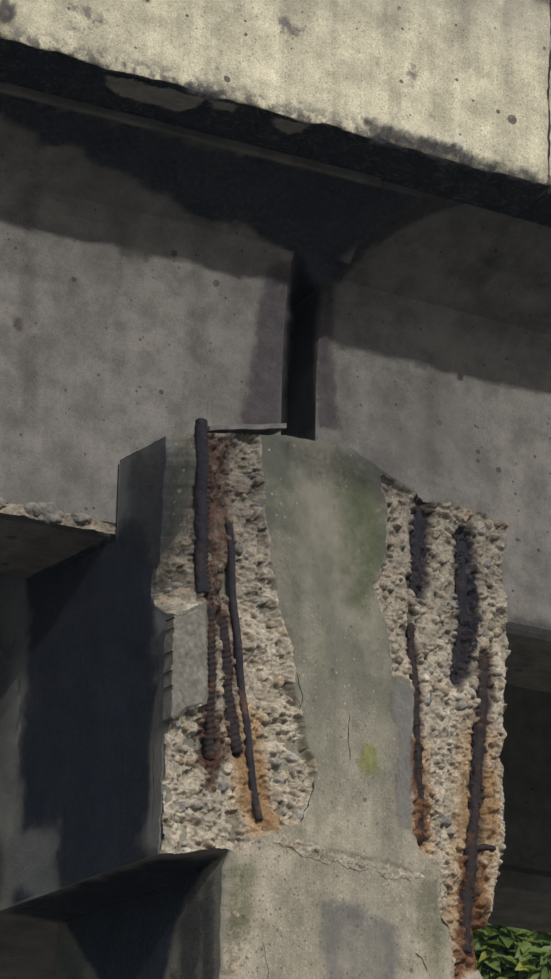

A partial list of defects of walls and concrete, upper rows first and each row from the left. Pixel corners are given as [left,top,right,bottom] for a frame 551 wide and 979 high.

damp [0,37,551,439]
corrosion [194,714,230,789]
spalling [151,418,320,854]
corrosion [411,739,431,837]
spalling [371,474,511,979]
corrosion [454,856,491,979]